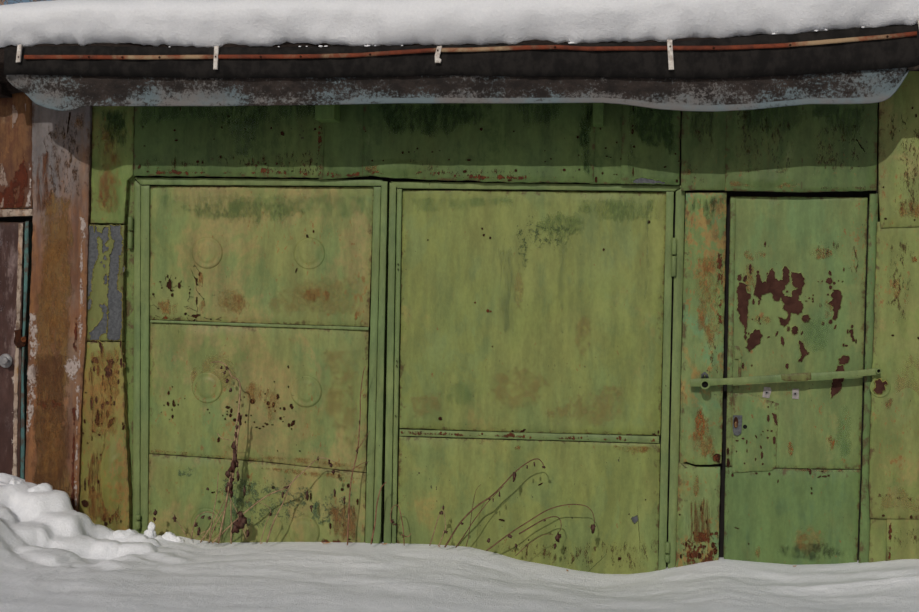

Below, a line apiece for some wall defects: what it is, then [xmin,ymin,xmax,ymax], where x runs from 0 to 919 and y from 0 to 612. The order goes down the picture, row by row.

corrosion [888,115,919,215]
corrosion [0,118,83,510]
peeling [64,217,126,508]
corrosion [700,253,723,373]
corrosion [683,480,728,565]